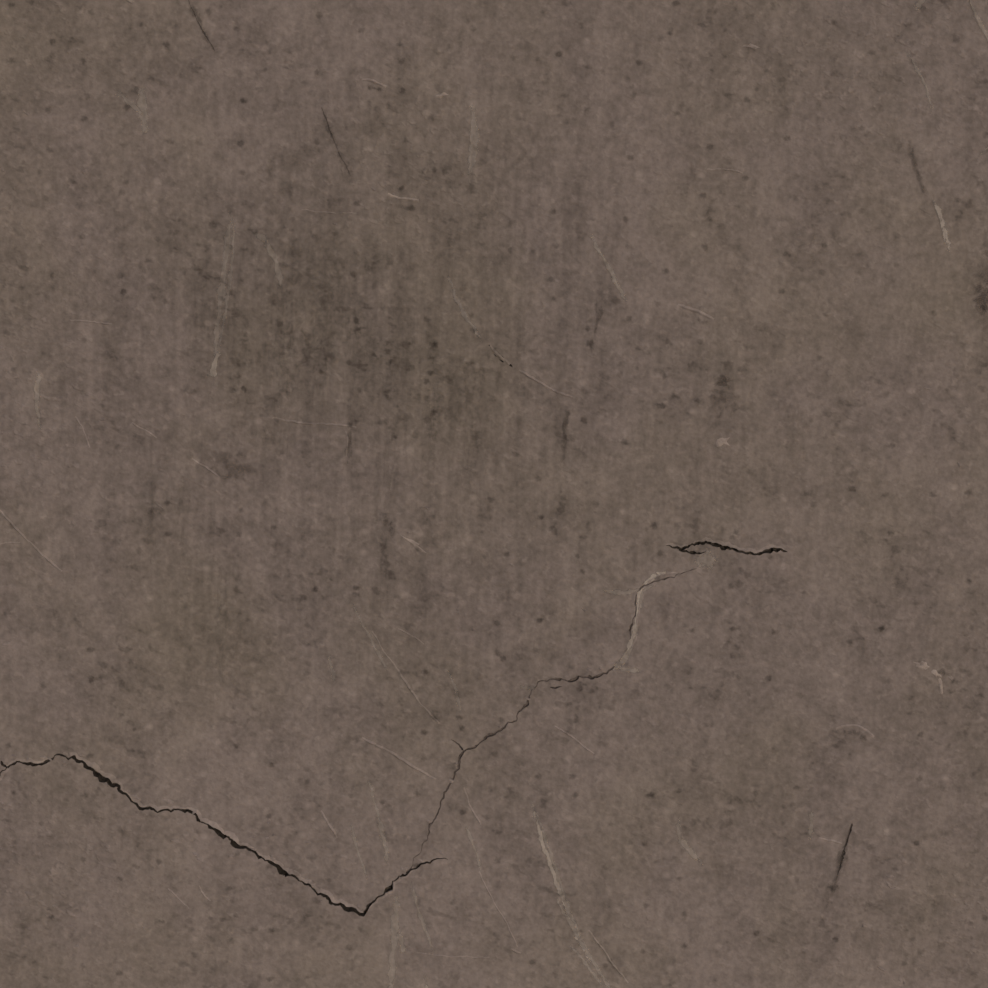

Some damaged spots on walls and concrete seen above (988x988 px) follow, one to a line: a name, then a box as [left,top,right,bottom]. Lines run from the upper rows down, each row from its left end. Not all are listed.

crack [0,537,787,917]